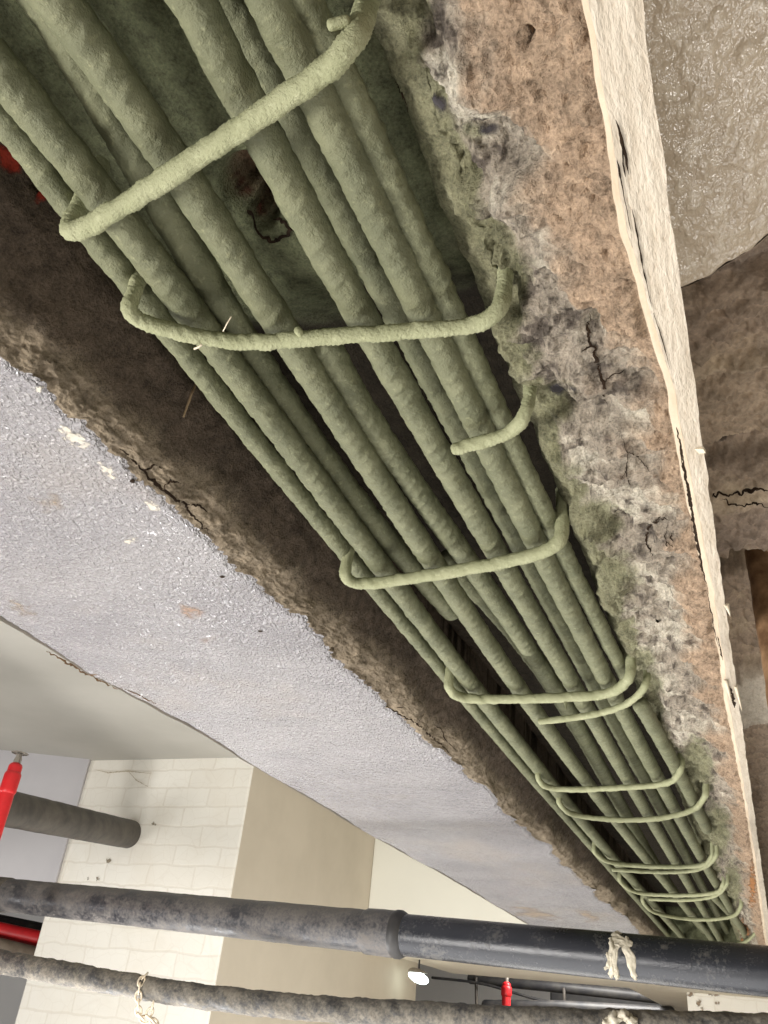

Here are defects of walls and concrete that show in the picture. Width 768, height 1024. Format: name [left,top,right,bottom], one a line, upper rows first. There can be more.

spalling [0,0,130,193]
spalling [87,0,231,147]
spalling [326,0,355,17]
crack [616,121,670,367]
crack [582,315,624,403]
crack [120,449,208,533]
spalling [0,143,743,943]
spalling [354,0,768,945]
crack [617,434,649,485]
crack [645,428,768,659]
crack [728,686,736,708]